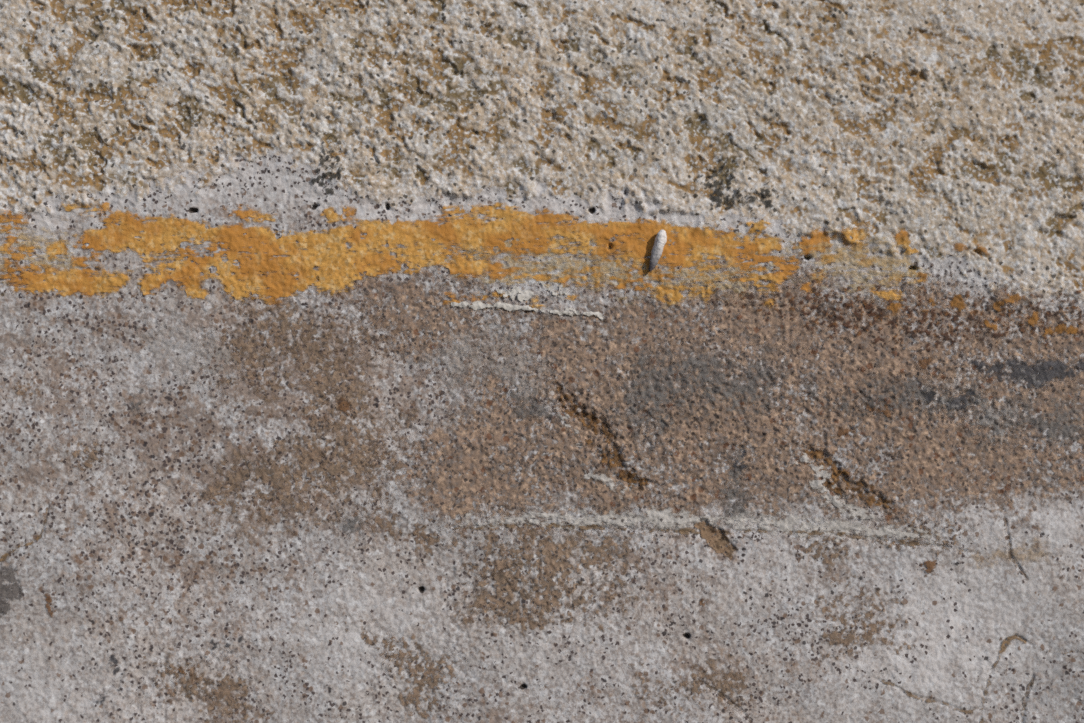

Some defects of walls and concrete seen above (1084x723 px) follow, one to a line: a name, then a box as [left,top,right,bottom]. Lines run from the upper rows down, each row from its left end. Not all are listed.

peeling [0,202,928,320]
damp [193,266,1084,635]